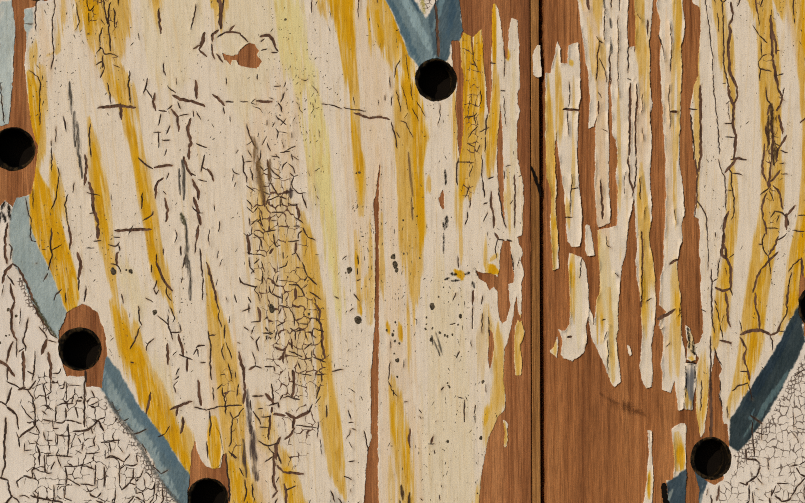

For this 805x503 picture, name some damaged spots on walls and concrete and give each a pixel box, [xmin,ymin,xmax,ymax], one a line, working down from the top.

peeling [0,0,48,207]
peeling [222,43,262,69]
peeling [364,165,380,503]
crack [450,290,490,358]
crack [456,50,541,272]
crack [563,84,578,129]
peeling [451,0,729,503]
crack [600,181,609,247]
crack [586,0,651,199]
crack [640,232,651,307]
crack [668,0,805,503]
crack [661,483,669,503]